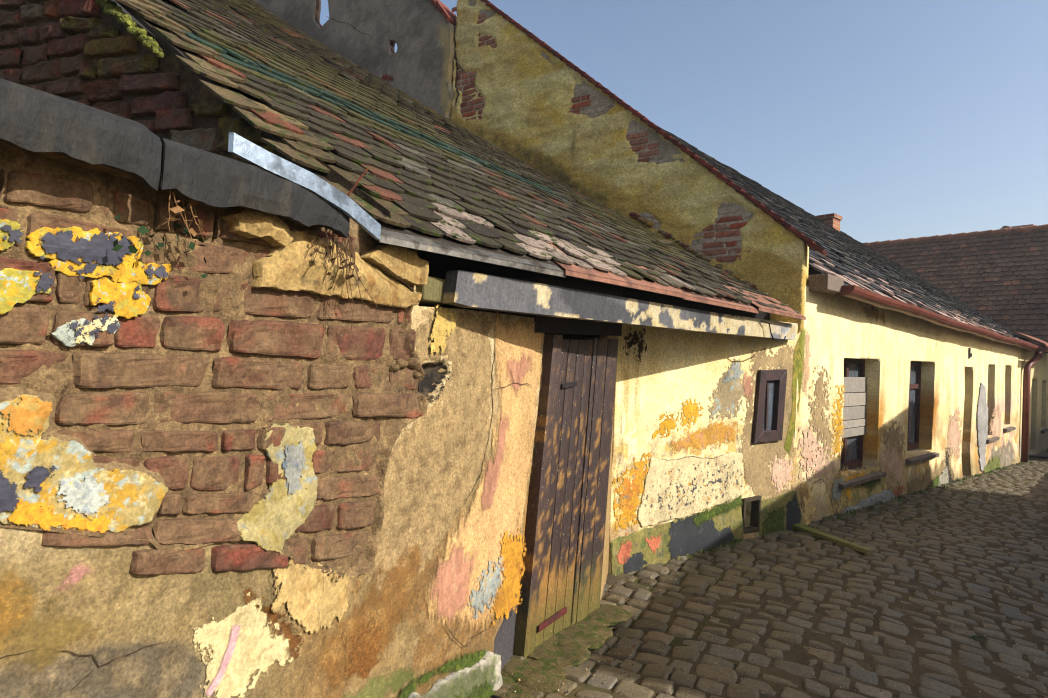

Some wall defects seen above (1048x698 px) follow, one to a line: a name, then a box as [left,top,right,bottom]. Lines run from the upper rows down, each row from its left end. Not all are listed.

spalling [451,67,485,121]
spalling [567,77,615,118]
spalling [626,118,685,164]
spalling [691,201,754,263]
spalling [0,145,544,698]
flaking render [610,345,905,575]